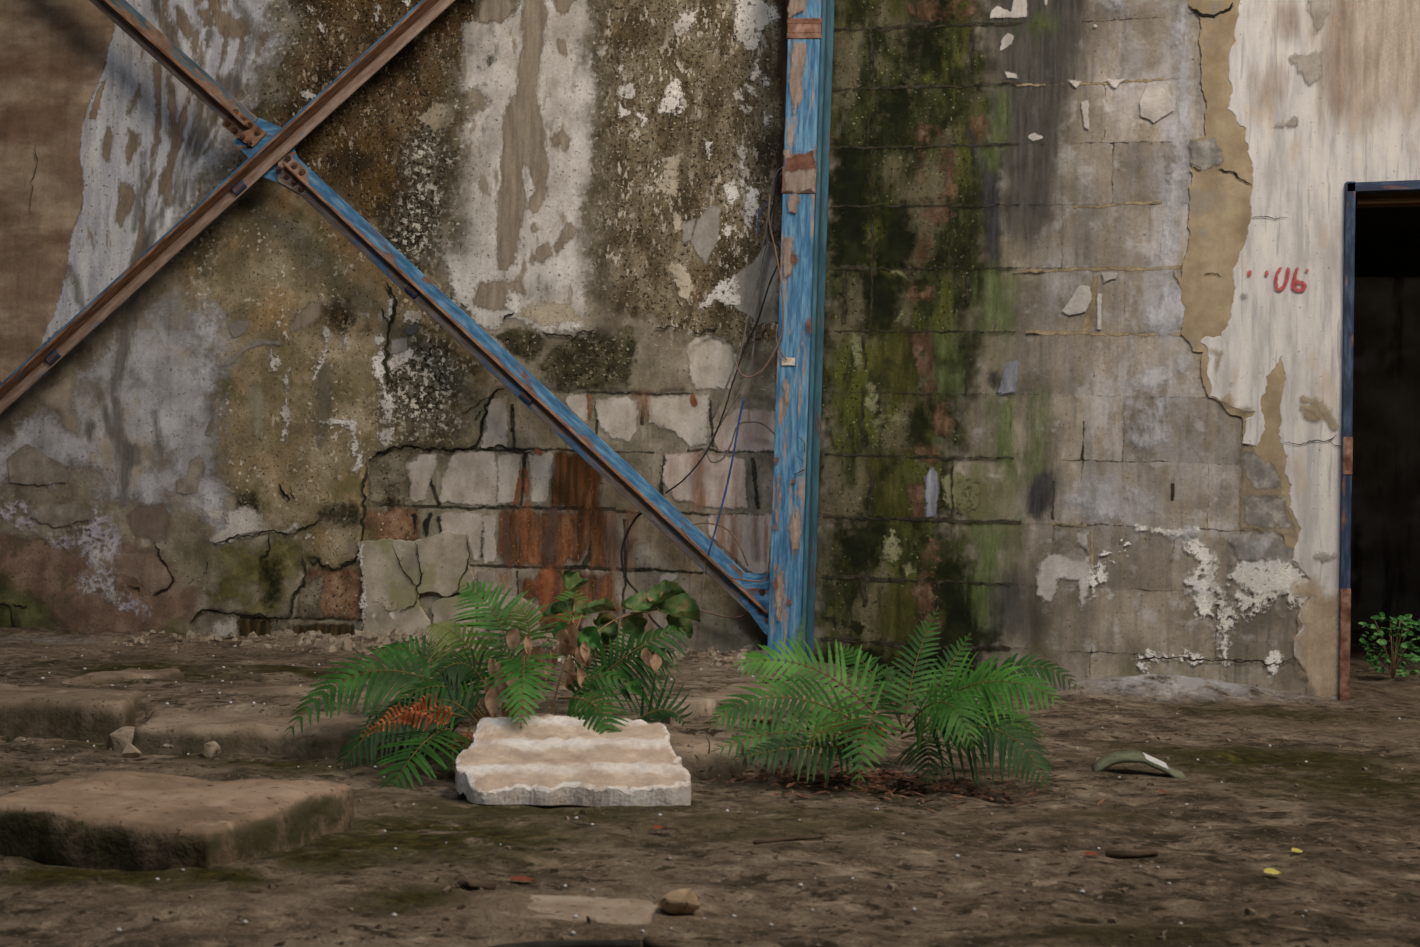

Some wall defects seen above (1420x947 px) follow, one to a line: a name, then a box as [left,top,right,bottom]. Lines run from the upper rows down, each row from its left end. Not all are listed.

peeling [0,0,238,383]
damp [139,76,248,257]
peeling [126,0,290,109]
damp [153,0,421,128]
damp [294,0,783,393]
rust [776,0,817,277]
damp [966,0,1080,330]
damp [0,497,196,634]
damp [167,177,488,637]
crack [128,389,535,623]
rust [497,448,618,626]
peeling [1173,0,1420,681]